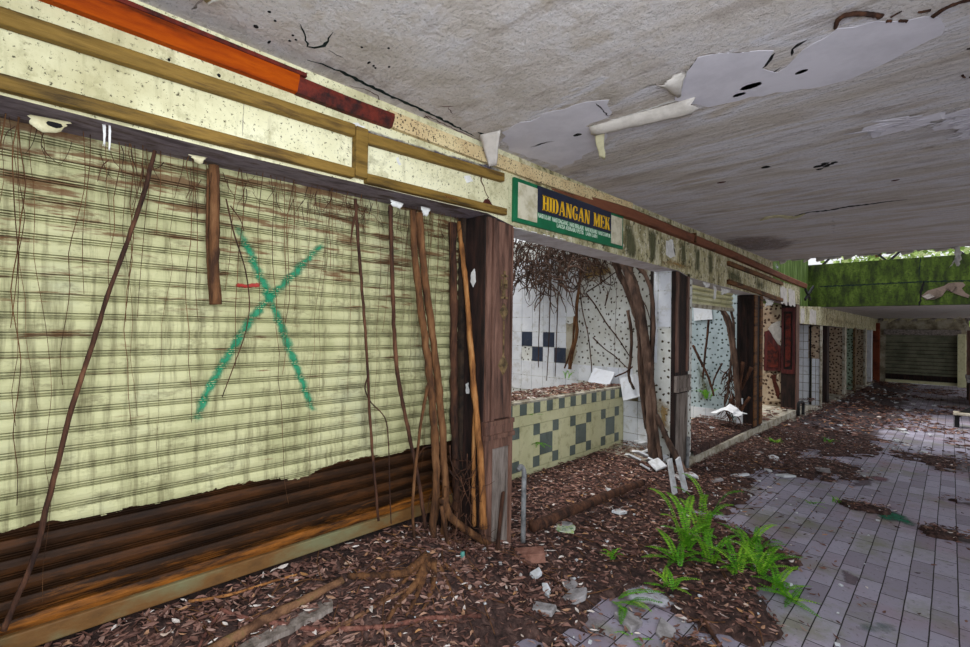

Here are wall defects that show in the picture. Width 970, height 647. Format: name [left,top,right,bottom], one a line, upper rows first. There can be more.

crack [300,24,484,141]
peeling [657,16,945,107]
peeling [502,100,613,168]